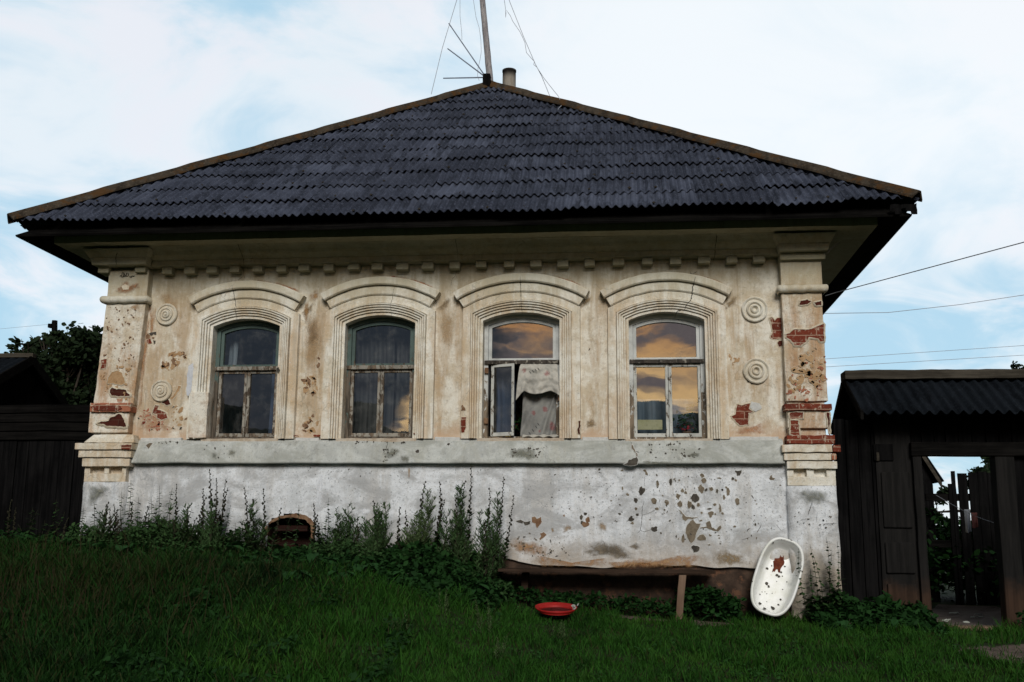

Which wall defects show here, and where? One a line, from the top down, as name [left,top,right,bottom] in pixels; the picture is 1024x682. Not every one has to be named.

spalling [798,298,823,307]
peeling [91,306,194,449]
spalling [730,401,762,427]
peeling [768,316,827,436]
peeling [607,441,781,553]